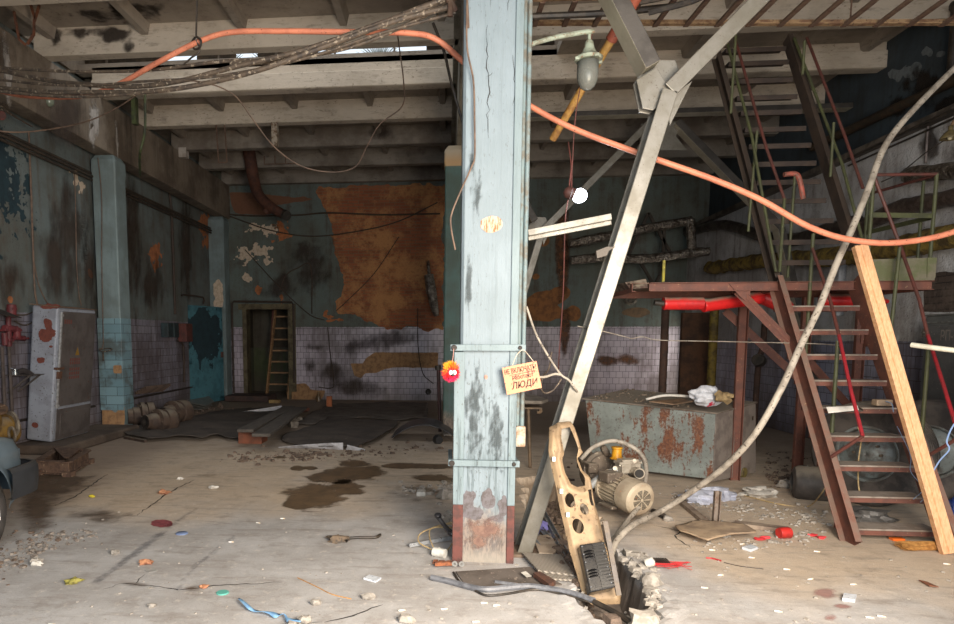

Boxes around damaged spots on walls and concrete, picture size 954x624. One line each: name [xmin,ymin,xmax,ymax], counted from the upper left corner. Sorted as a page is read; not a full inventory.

peeling [0,117,38,240]
peeling [234,221,293,295]
flaking render [316,183,445,332]